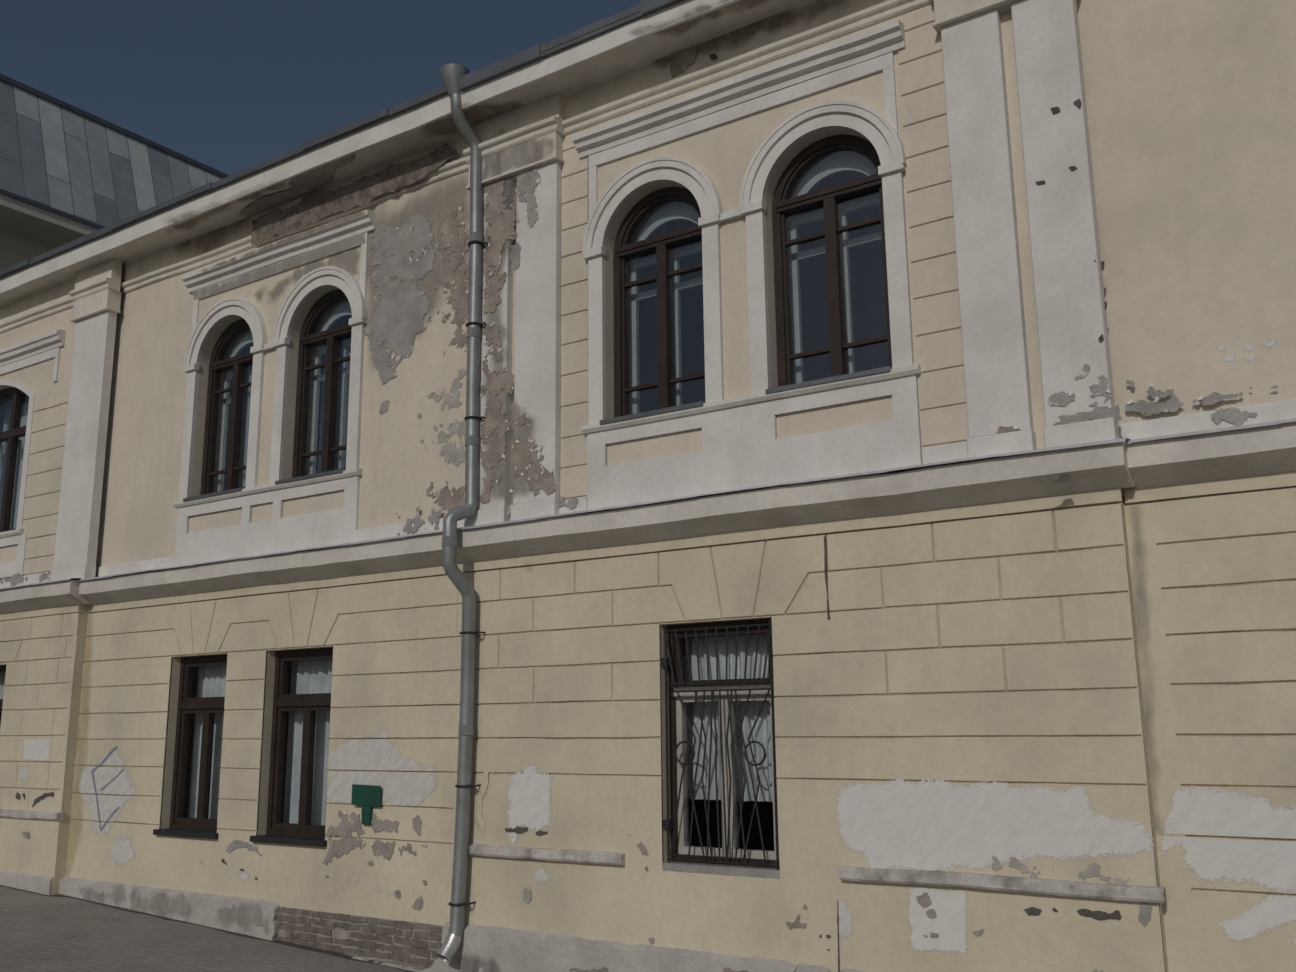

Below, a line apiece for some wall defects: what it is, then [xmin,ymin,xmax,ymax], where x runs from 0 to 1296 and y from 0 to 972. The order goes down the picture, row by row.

flaking render [668,46,718,78]
flaking render [240,154,356,217]
peeling [364,168,580,536]
peeling [1047,364,1257,428]
crack [823,536,831,619]
peeling [322,810,427,878]